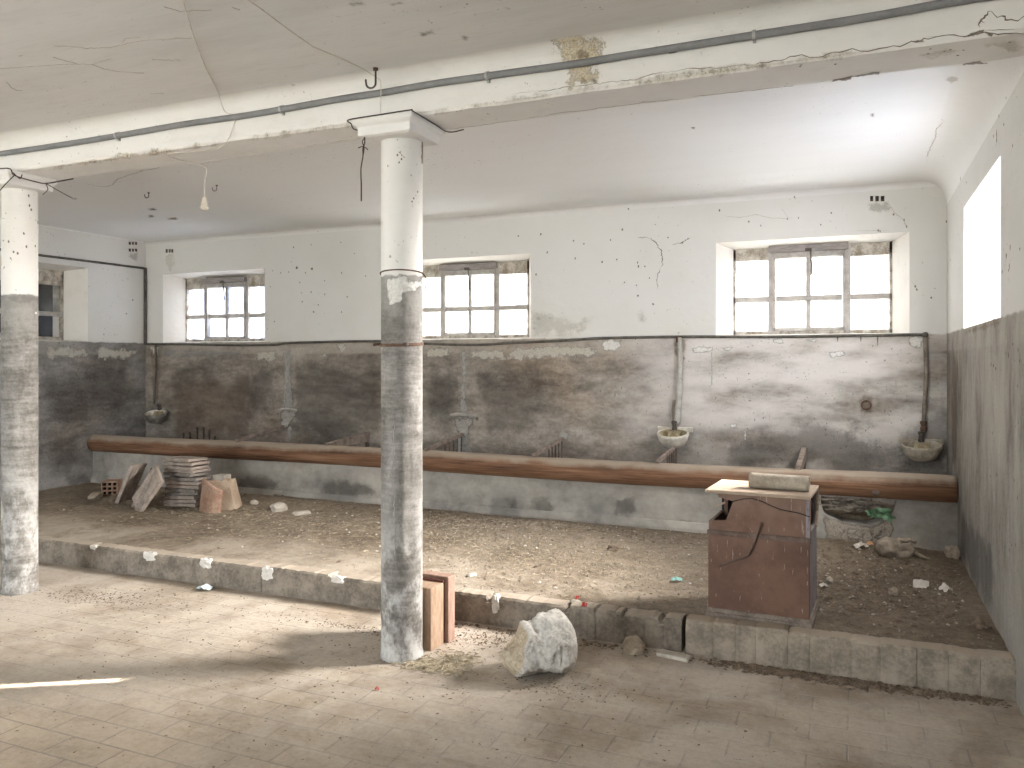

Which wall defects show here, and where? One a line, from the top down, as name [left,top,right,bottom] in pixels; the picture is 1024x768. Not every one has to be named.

crack [2,37,189,91]
peeling [553,36,602,91]
crack [456,11,1024,129]
peeling [387,275,421,305]
peeling [426,347,450,357]
peeling [468,339,621,361]
spalling [823,518,893,545]